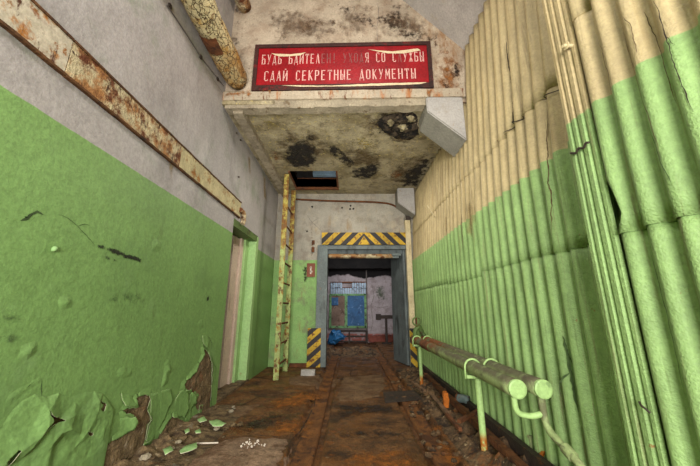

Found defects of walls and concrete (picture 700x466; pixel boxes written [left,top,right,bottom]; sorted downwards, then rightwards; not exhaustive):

leakage [279,112,417,179]
spalling [377,112,419,140]
leakage [395,156,433,187]
corrosion [439,52,457,88]
crack [542,90,559,233]
crack [622,1,694,185]
peeling [0,335,213,466]